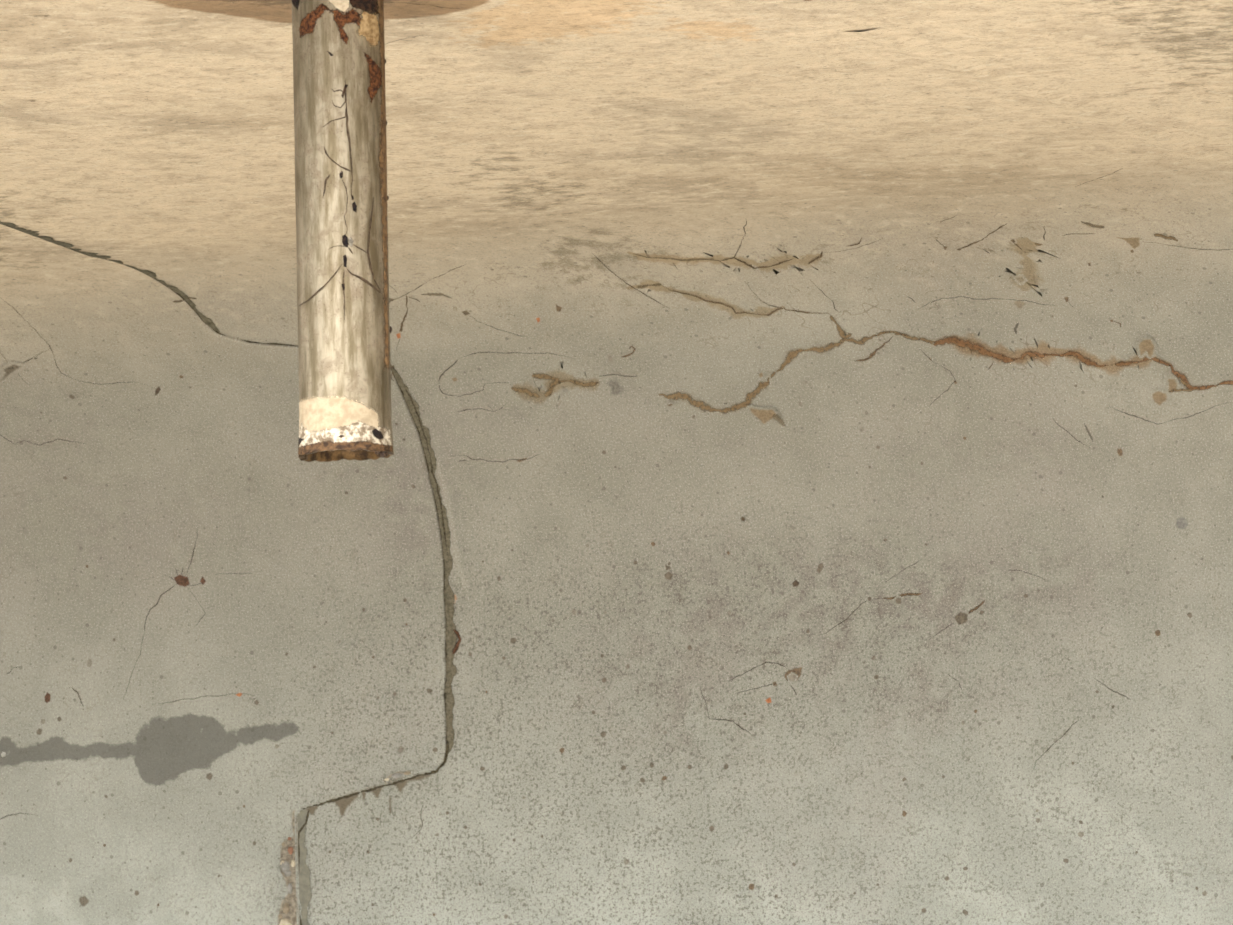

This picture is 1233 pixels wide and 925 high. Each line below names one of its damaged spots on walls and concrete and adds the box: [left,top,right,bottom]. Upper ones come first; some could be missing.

damp [134,0,300,26]
damp [384,0,509,22]
corrosion [298,0,390,368]
crack [299,83,1233,427]
crack [1052,417,1093,445]
damp [0,707,304,792]
spalling [274,804,302,925]